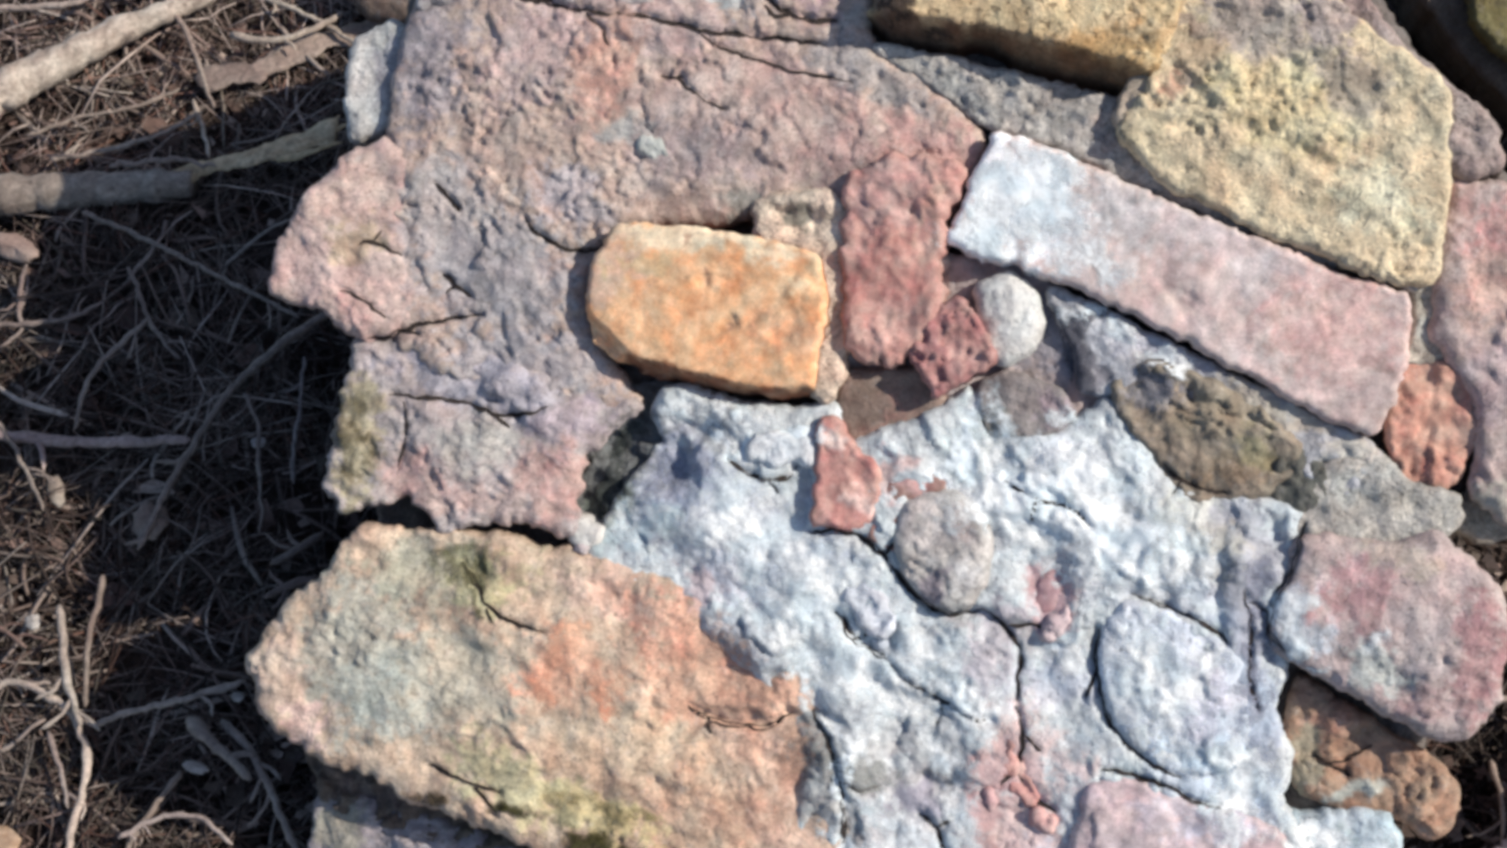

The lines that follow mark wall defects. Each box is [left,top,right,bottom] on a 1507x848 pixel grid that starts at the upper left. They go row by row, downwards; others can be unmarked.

crack [523,0,852,82]
crack [340,274,483,341]